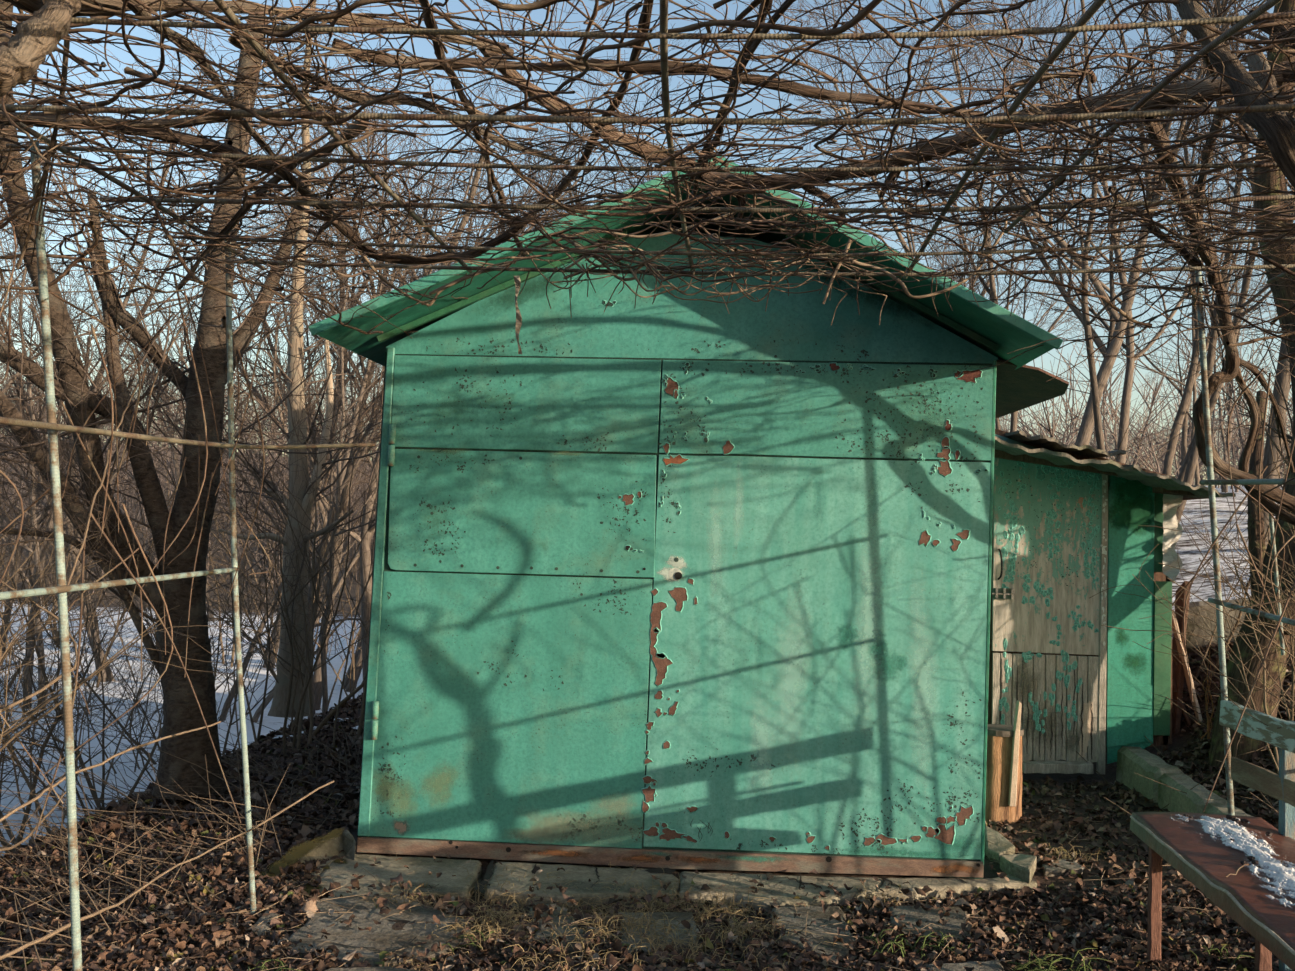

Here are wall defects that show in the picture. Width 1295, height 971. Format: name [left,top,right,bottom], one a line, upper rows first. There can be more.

peeling [595,340,735,553]
peeling [557,573,698,844]
peeling [674,746,780,777]
leakage [840,573,930,715]
peeling [805,689,981,856]